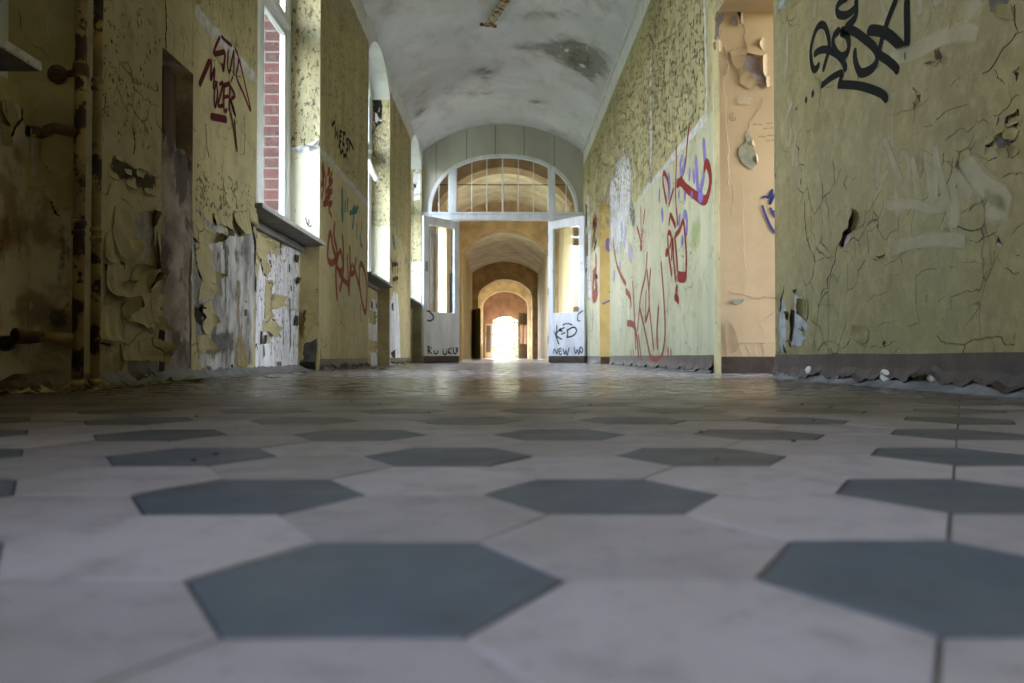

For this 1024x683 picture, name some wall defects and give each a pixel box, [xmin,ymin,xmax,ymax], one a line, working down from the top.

crack [103,63,159,154]
peeling [100,0,178,374]
peeling [191,163,317,371]
damp [536,41,605,78]
peeling [585,0,773,344]
peeling [774,286,808,355]
crack [804,5,1024,354]
peeling [984,109,1020,159]